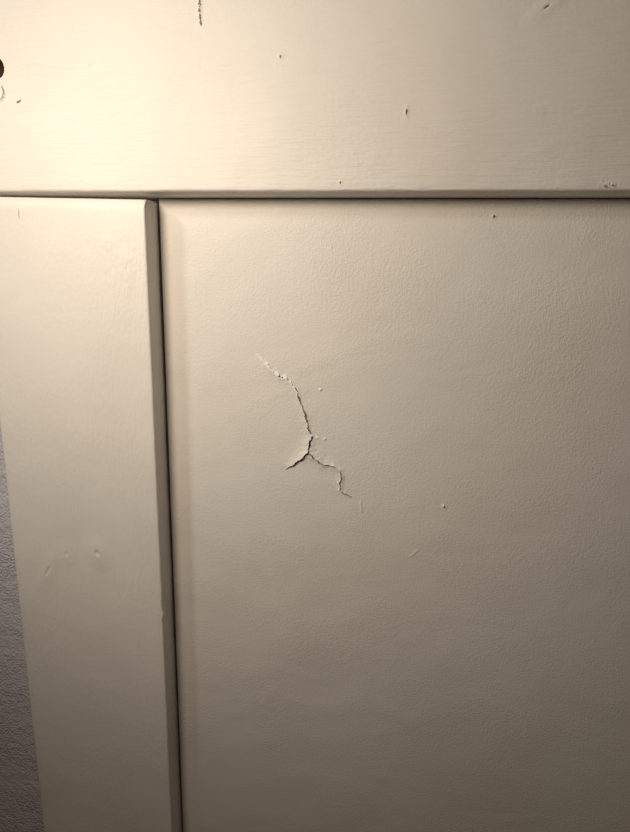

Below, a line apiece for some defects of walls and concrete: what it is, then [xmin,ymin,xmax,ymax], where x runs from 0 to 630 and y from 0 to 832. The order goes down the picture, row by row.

crack [255,352,363,513]